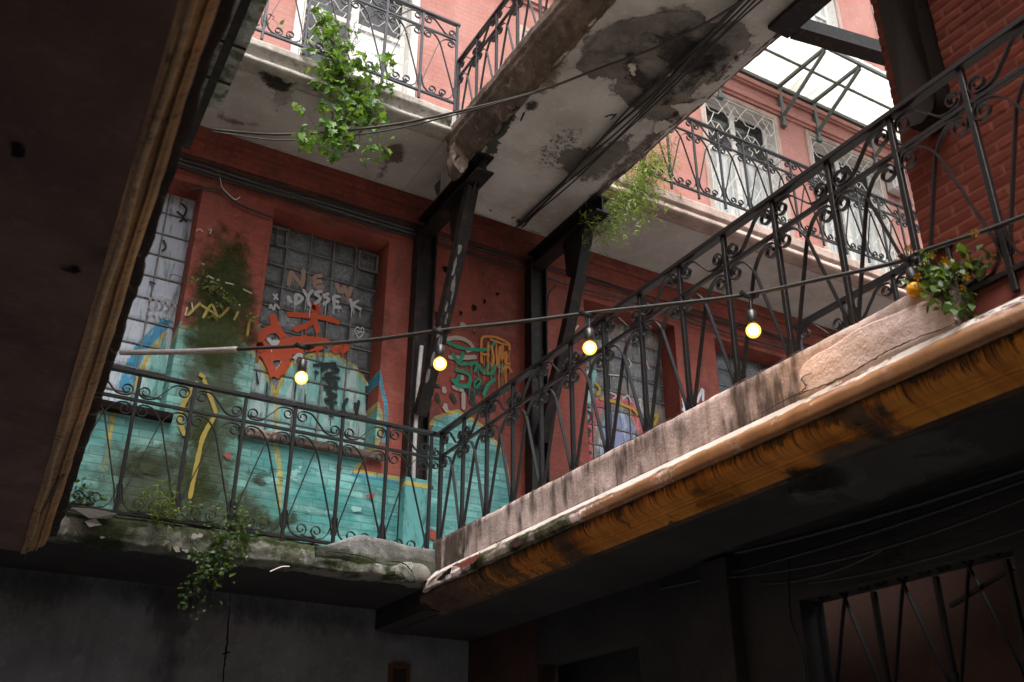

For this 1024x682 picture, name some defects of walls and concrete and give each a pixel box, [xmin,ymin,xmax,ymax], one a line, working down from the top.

leakage [258,71,296,112]
leakage [485,0,752,196]
crack [761,323,958,414]
leakage [428,295,1024,580]
crack [222,594,231,682]